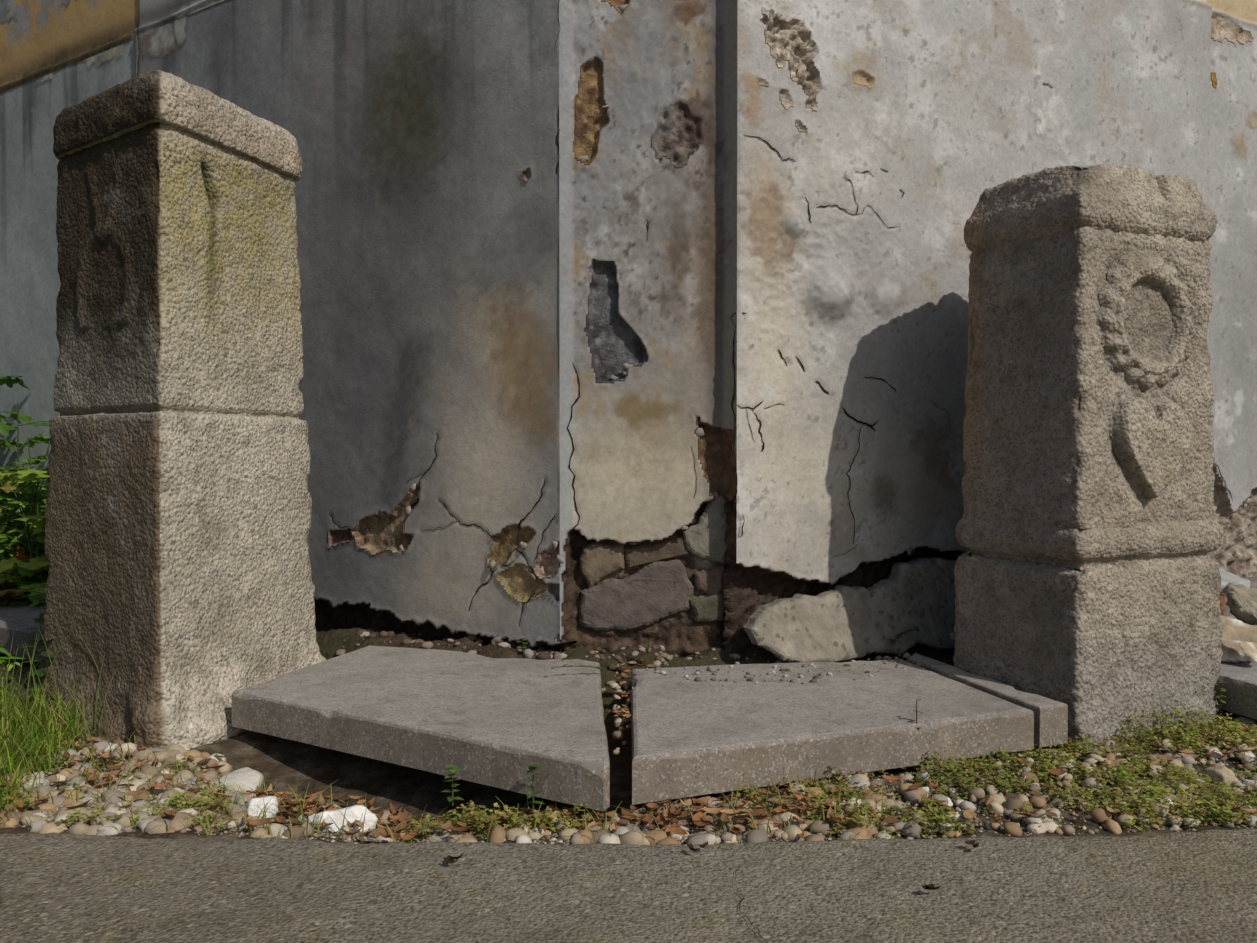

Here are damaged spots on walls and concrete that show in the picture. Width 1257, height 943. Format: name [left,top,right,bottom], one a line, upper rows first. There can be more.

water stain [137,23,177,57]
spalling [573,56,610,164]
spalling [601,0,630,14]
crack [743,134,794,161]
spalling [756,7,823,132]
crack [805,169,905,228]
spalling [585,259,648,383]
crack [406,364,580,627]
spalling [314,417,965,657]
crack [730,312,784,536]
crack [778,350,879,557]
spalling [1207,464,1257,578]